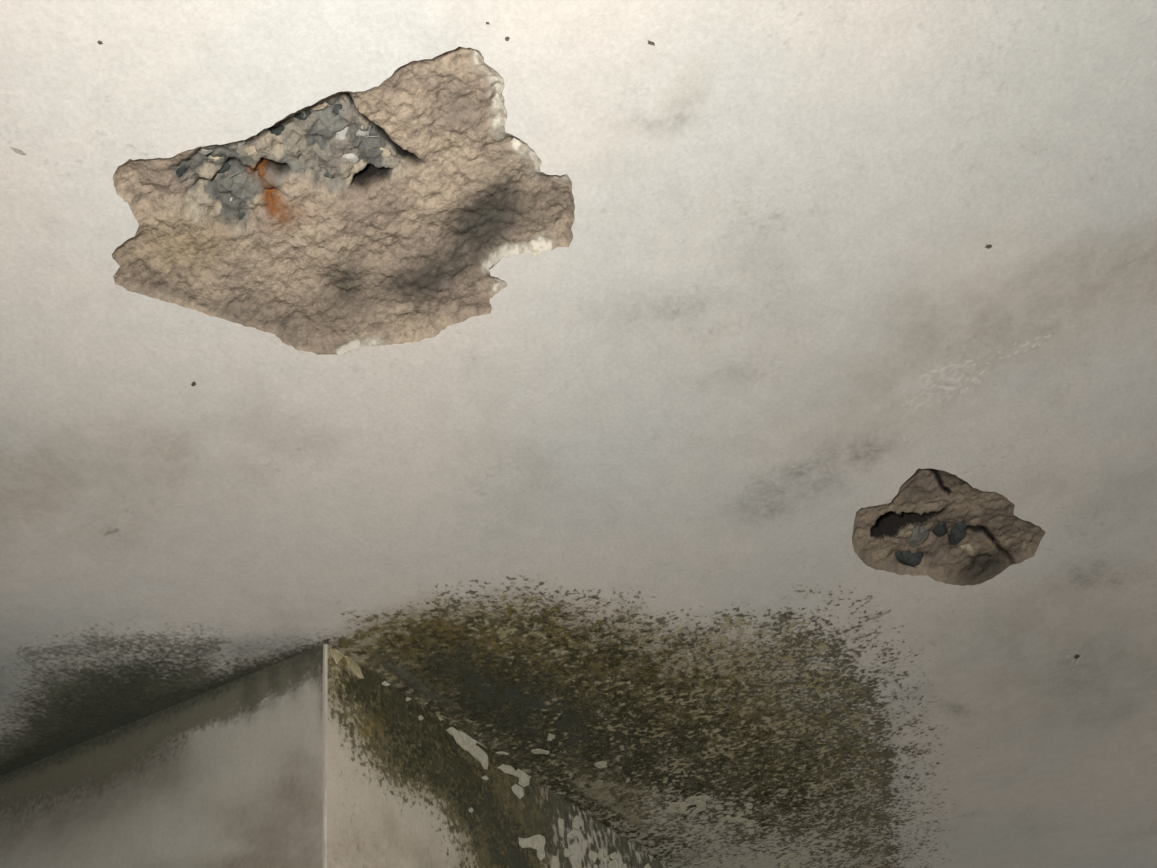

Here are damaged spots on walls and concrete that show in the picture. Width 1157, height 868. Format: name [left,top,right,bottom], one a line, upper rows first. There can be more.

spalling [112,47,575,355]
spalling [852,468,1057,586]
leakage [0,576,945,868]
peeling [438,716,530,799]
peeling [531,733,555,754]
peeling [519,815,627,868]
peeling [665,795,713,814]
peeling [715,803,755,834]